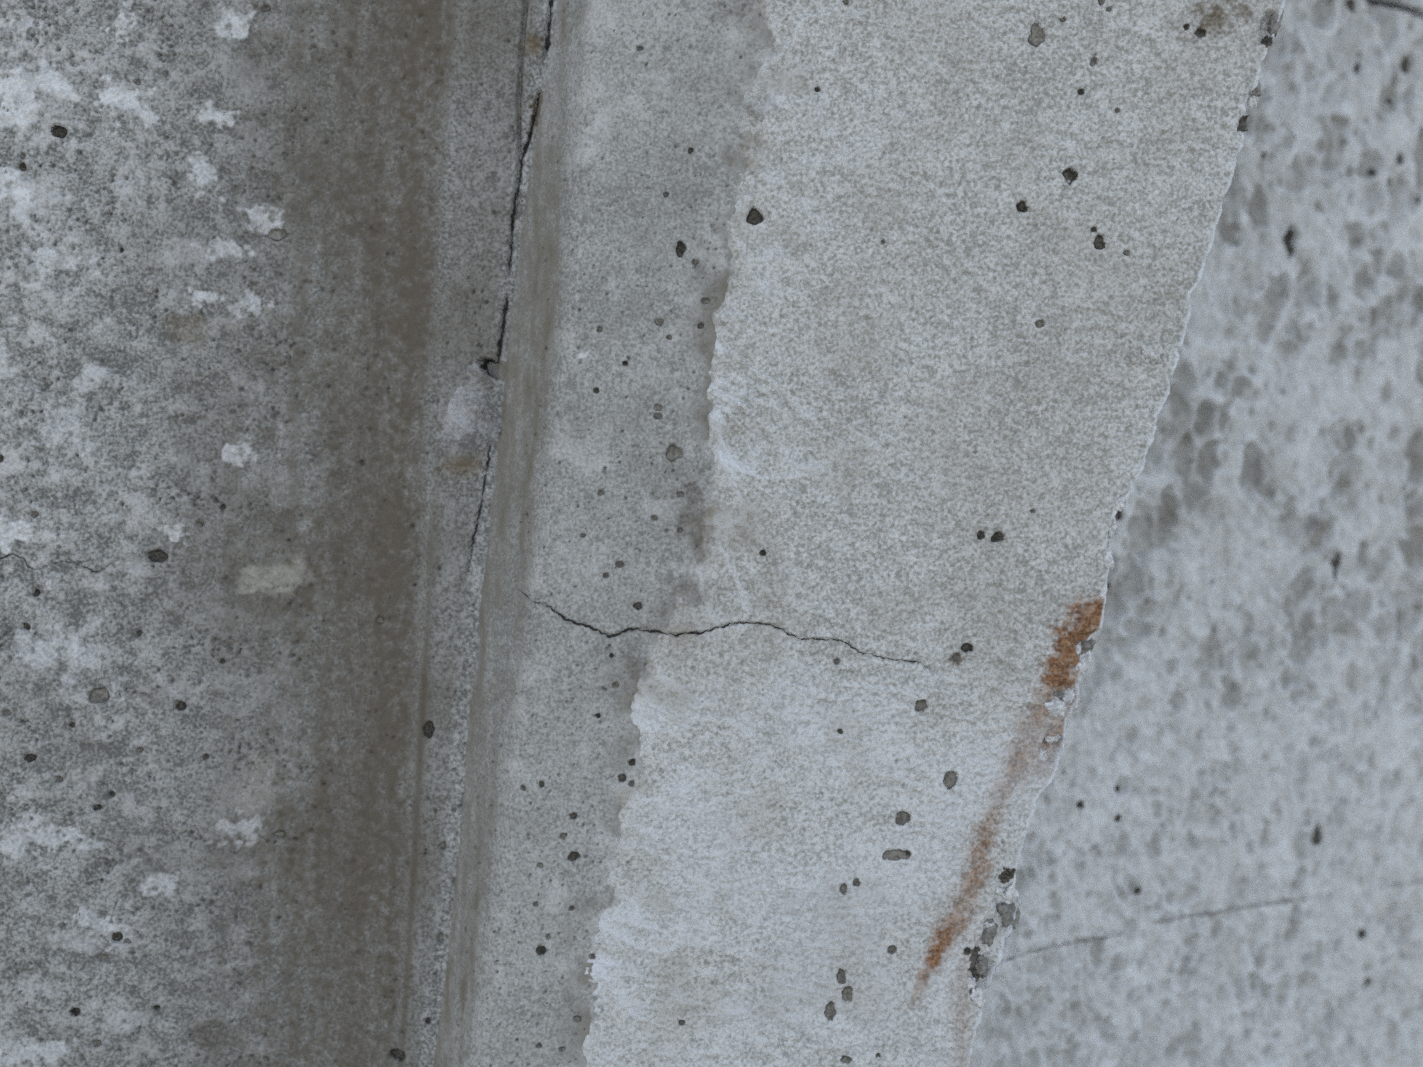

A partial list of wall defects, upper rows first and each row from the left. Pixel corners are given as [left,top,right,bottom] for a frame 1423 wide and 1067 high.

spalling [1261,9,1284,48]
spalling [1237,81,1261,132]
crack [497,0,554,363]
crack [467,445,491,572]
spalling [1100,494,1127,599]
crack [517,589,934,672]
spalling [1044,638,1097,717]
corrosion [906,588,1107,1067]
spalling [963,867,1020,1010]